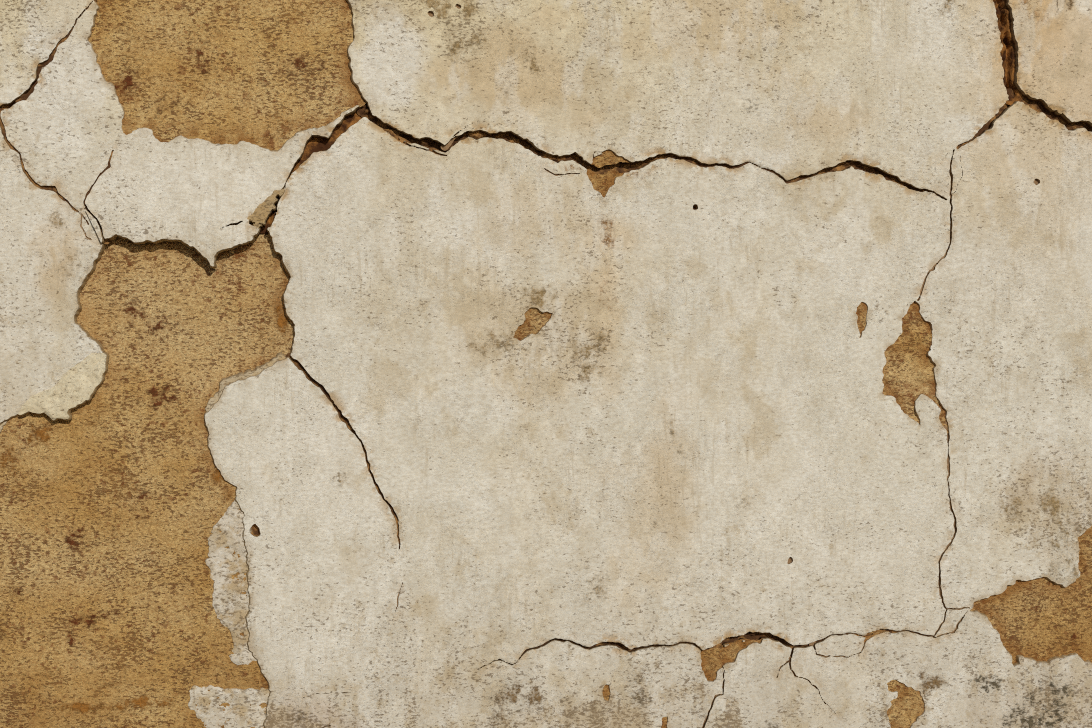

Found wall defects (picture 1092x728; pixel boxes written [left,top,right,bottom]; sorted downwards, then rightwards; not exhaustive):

crack [0,0,114,244]
peeling [89,0,366,150]
crack [222,196,280,234]
crack [292,0,1092,302]
peeling [514,308,552,340]
peeling [882,298,948,433]
peeling [0,233,294,728]
crack [286,353,400,549]
peeling [700,639,761,681]
crack [498,421,964,704]
peeling [887,680,925,728]
peeling [971,525,1092,664]